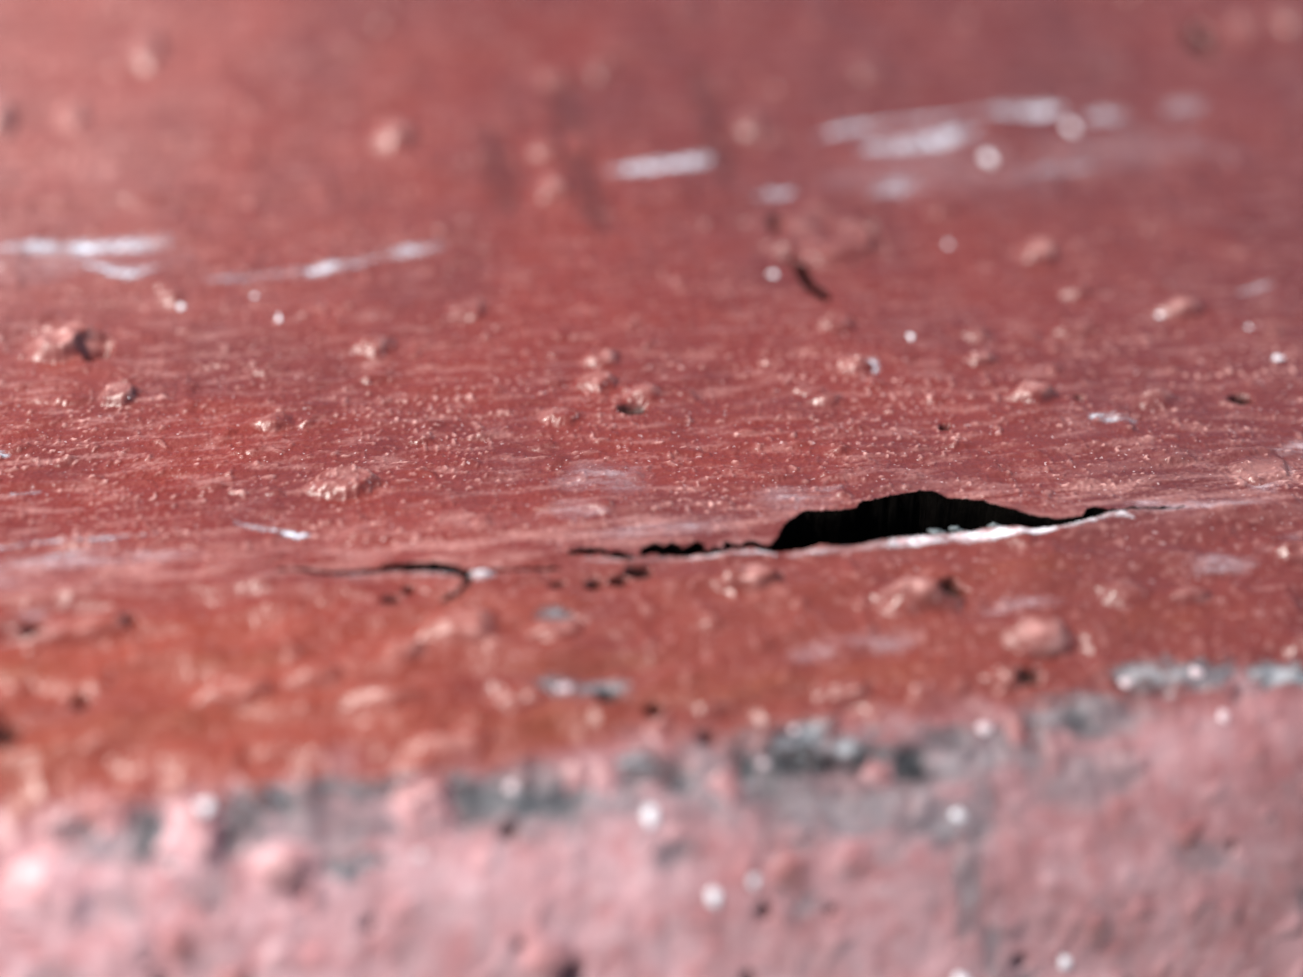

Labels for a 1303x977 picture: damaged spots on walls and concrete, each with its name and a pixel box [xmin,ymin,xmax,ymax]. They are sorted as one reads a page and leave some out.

crack [276,490,1184,602]